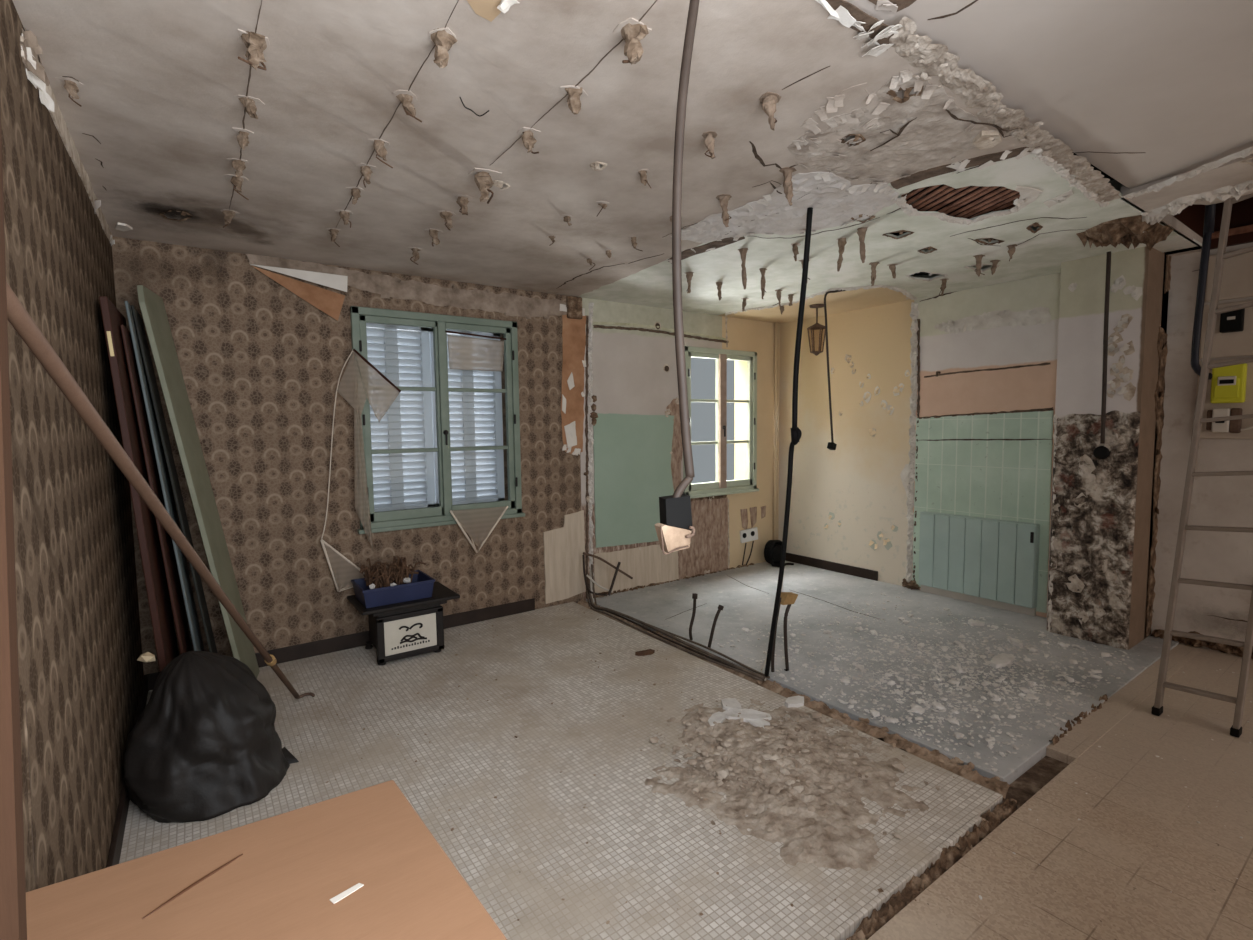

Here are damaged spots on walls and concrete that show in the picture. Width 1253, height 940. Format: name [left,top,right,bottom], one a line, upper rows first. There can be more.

damp [145,205,196,218]
flaking render [246,254,726,455]
spalling [793,0,1253,293]
peeling [1110,275,1142,301]
peeling [594,397,728,593]
spalling [1047,314,1140,650]
spalling [1146,327,1168,637]